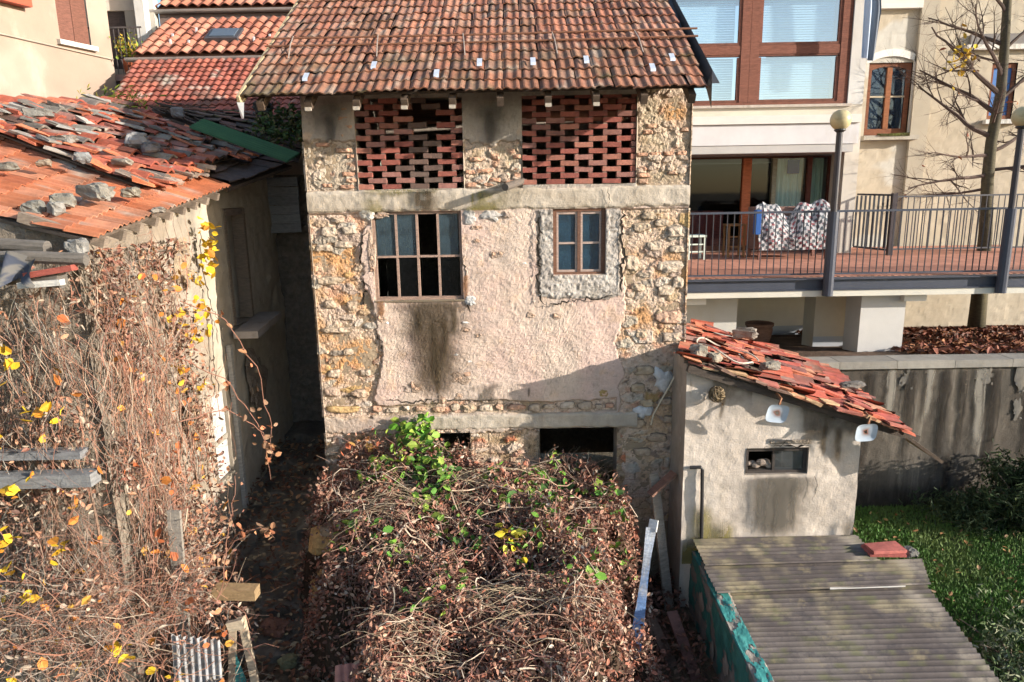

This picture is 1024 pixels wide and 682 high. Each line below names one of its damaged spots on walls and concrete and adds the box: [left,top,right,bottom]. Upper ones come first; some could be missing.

spalling [464,140,522,189]
spalling [636,88,693,185]
leakage [406,302,461,391]
spalling [307,208,690,521]
leakage [855,369,1003,508]